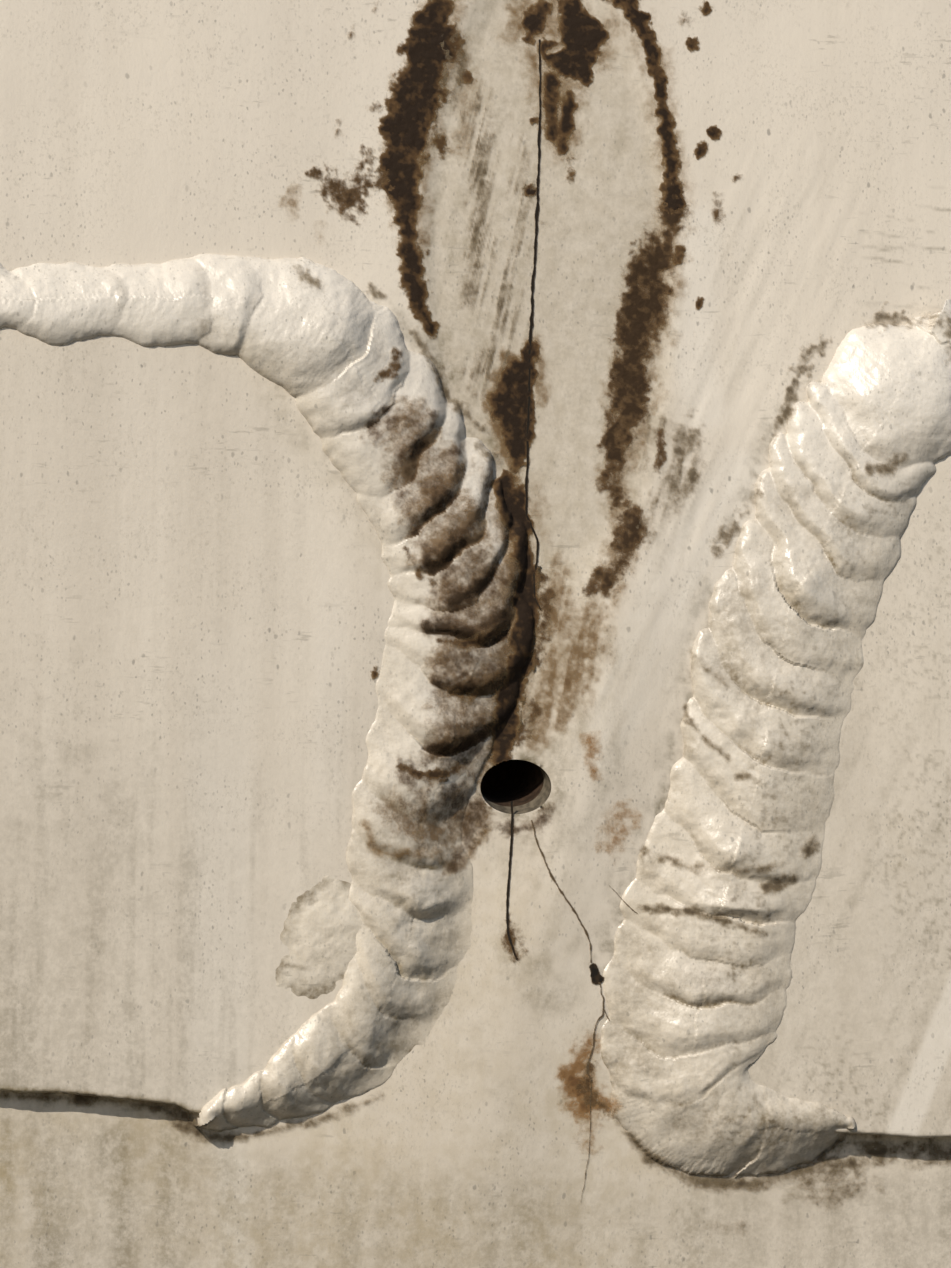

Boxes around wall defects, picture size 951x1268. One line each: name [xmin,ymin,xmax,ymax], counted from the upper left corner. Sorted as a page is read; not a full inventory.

rust [305,0,473,339]
crack [525,39,541,610]
rust [365,0,722,872]
crack [506,801,610,1199]
rust [557,1039,619,1119]